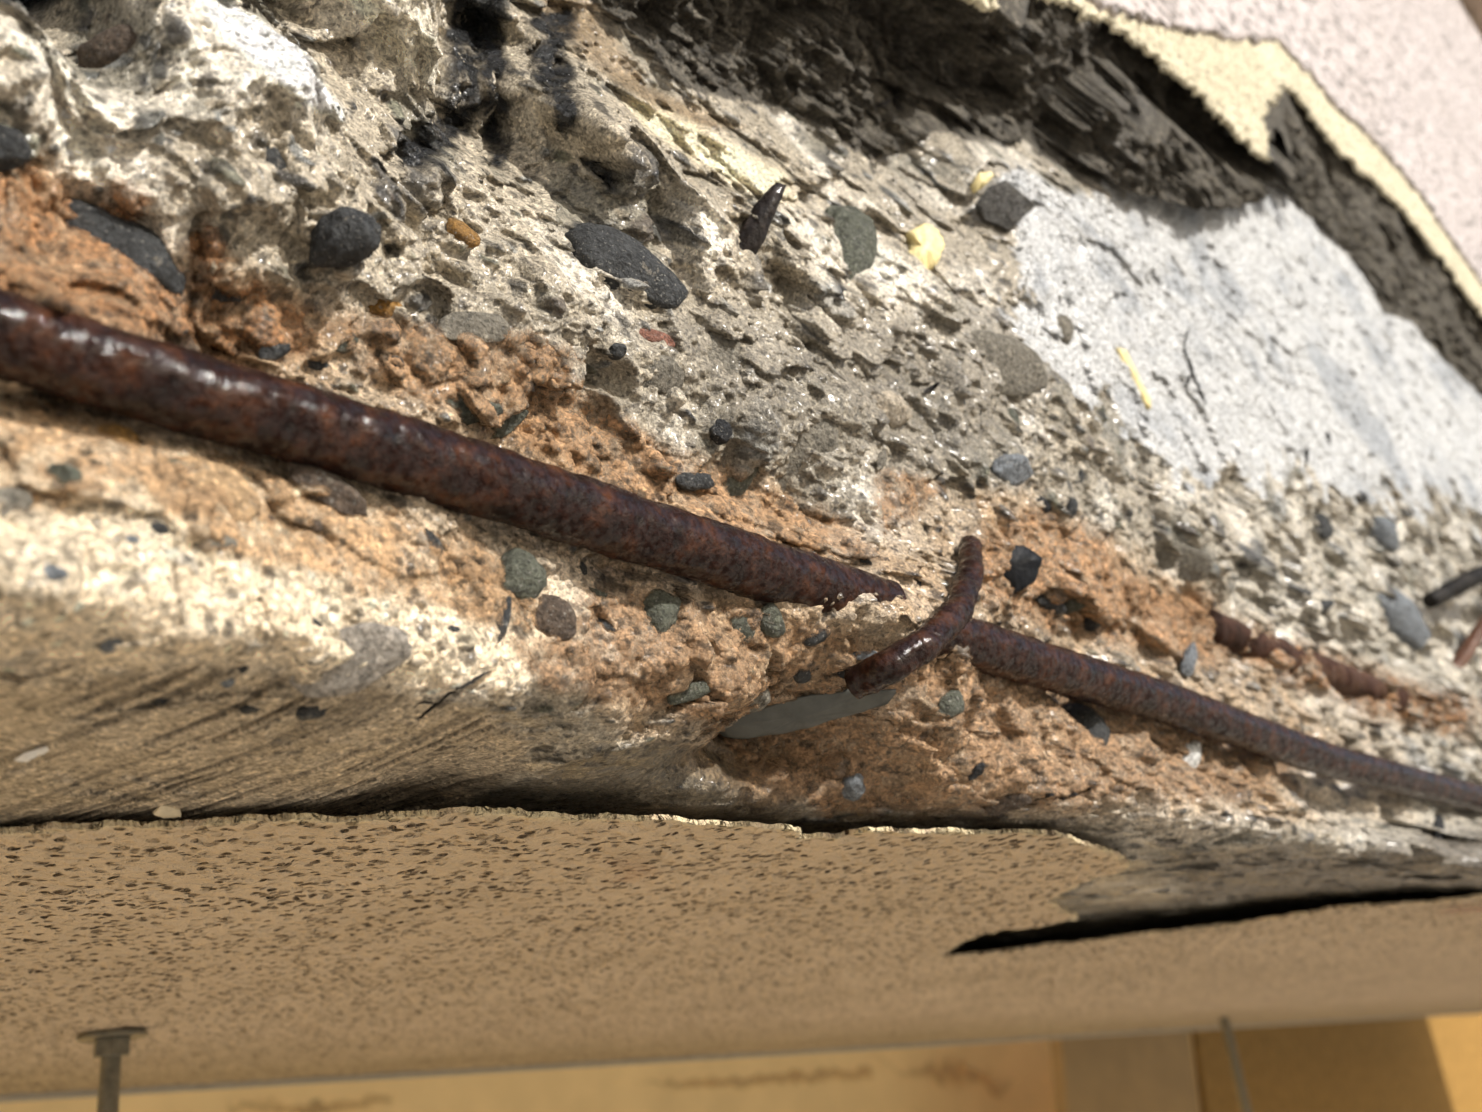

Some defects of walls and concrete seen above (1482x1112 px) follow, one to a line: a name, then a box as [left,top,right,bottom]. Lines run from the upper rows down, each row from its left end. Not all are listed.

peeling [961,0,1000,12]
spalling [399,0,512,168]
spalling [527,8,579,134]
peeling [975,181,1036,232]
peeling [1043,0,1482,317]
rust [0,171,864,559]
peeling [14,746,49,762]
peeling [153,805,181,821]
rust [0,402,1288,815]
spalling [938,689,969,719]
spalling [913,645,996,691]
rust [981,510,1469,732]